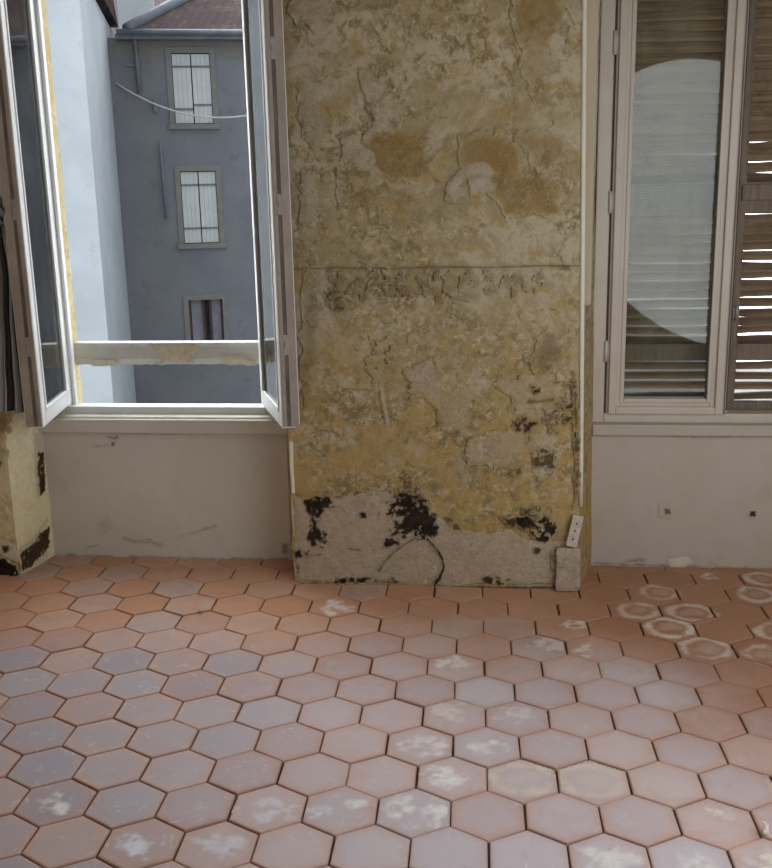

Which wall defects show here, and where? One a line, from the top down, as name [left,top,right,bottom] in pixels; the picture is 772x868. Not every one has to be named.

leakage [510,0,567,104]
leakage [335,125,433,210]
leakage [458,120,576,219]
flaking render [32,429,46,497]
flaking render [0,517,51,576]
leakage [313,599,357,617]
flaking render [290,487,566,589]
leakage [614,583,772,667]
leakage [733,571,772,605]
leakage [33,789,74,817]
leakage [187,733,647,868]
leakage [112,832,159,864]